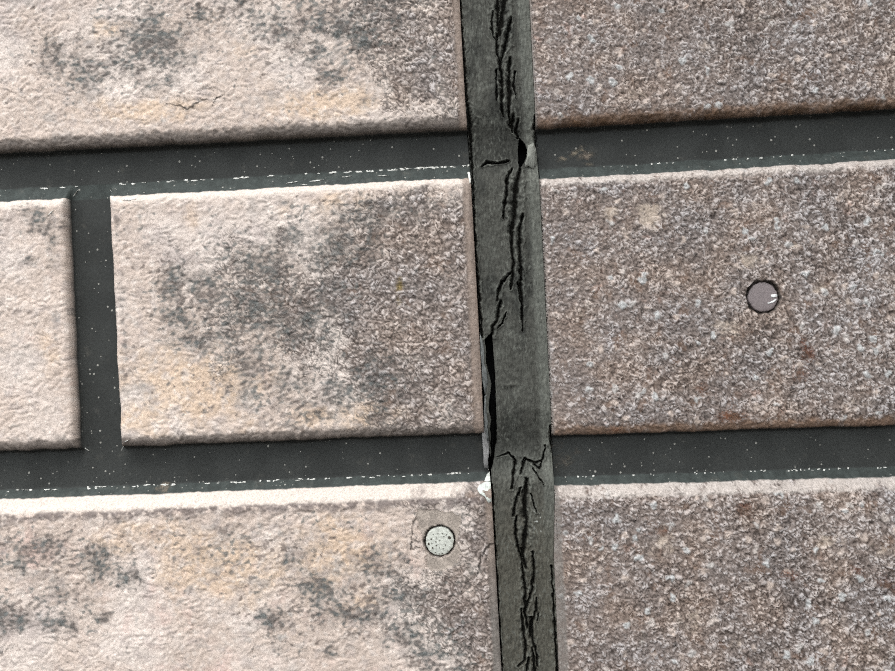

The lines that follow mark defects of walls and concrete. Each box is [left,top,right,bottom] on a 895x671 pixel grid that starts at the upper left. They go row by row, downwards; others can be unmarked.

water stain [41,2,205,93]
water stain [291,46,349,85]
water stain [250,0,399,60]
crack [491,0,536,148]
crack [460,0,524,337]
water stain [150,265,219,349]
water stain [227,292,333,383]
water stain [84,545,141,587]
water stain [254,607,284,630]
water stain [298,544,428,624]
water stain [383,622,466,671]
crack [476,425,558,671]